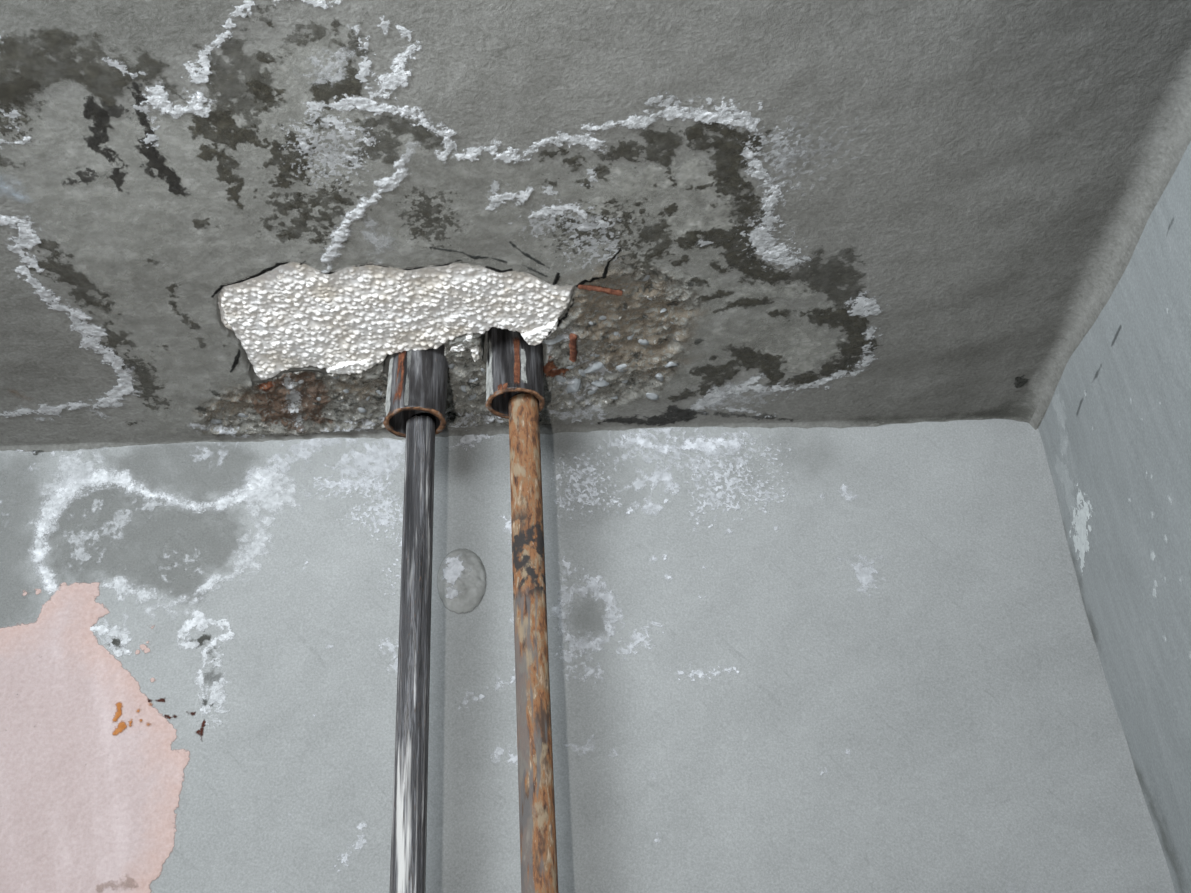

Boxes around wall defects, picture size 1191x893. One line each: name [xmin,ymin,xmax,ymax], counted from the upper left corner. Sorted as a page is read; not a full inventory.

crack [211,242,621,339]
damp [0,0,888,533]
crack [230,350,240,372]
spalling [193,364,388,436]
corrosion [393,351,406,402]
spalling [444,338,509,427]
corrosion [498,338,520,391]
corrosion [543,356,569,377]
spalling [539,264,704,425]
damp [18,450,296,615]
damp [299,416,404,594]
peeling [90,624,154,657]